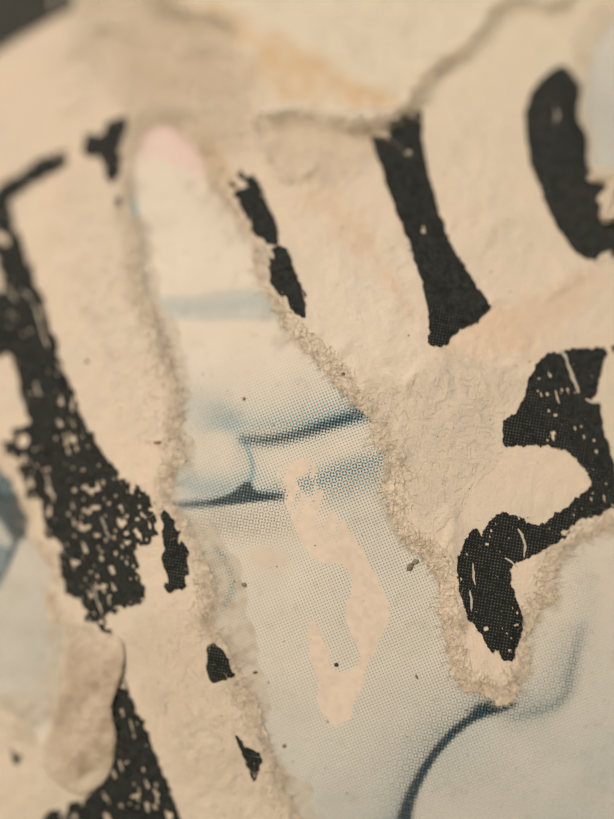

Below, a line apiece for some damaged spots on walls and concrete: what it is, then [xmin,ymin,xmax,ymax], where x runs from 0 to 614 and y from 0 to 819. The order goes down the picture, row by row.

peeling [252,112,384,194]
peeling [276,458,391,727]
peeling [42,596,299,819]